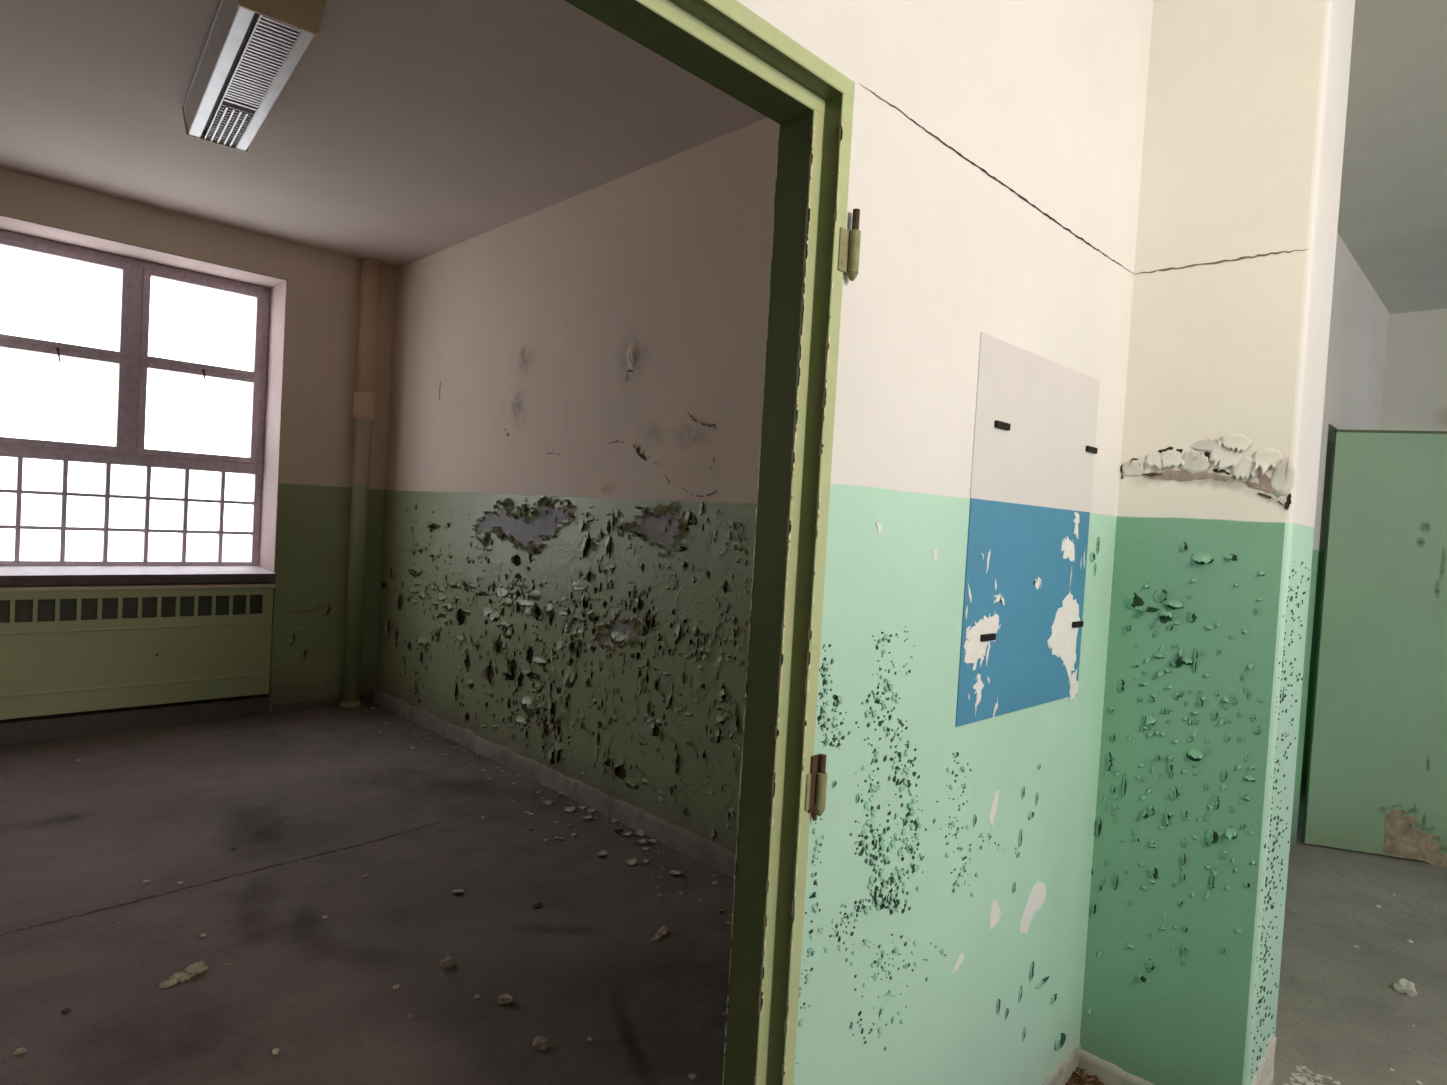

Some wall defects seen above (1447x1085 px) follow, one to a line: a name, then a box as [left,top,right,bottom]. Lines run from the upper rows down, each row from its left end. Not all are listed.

crack [861,84,1307,275]
peeling [1090,537,1100,577]
peeling [378,495,754,840]
peeling [797,626,1038,1051]
peeling [996,961,1057,1020]
peeling [1012,881,1046,933]
peeling [1054,1033,1066,1051]
peeling [1091,542,1309,1085]